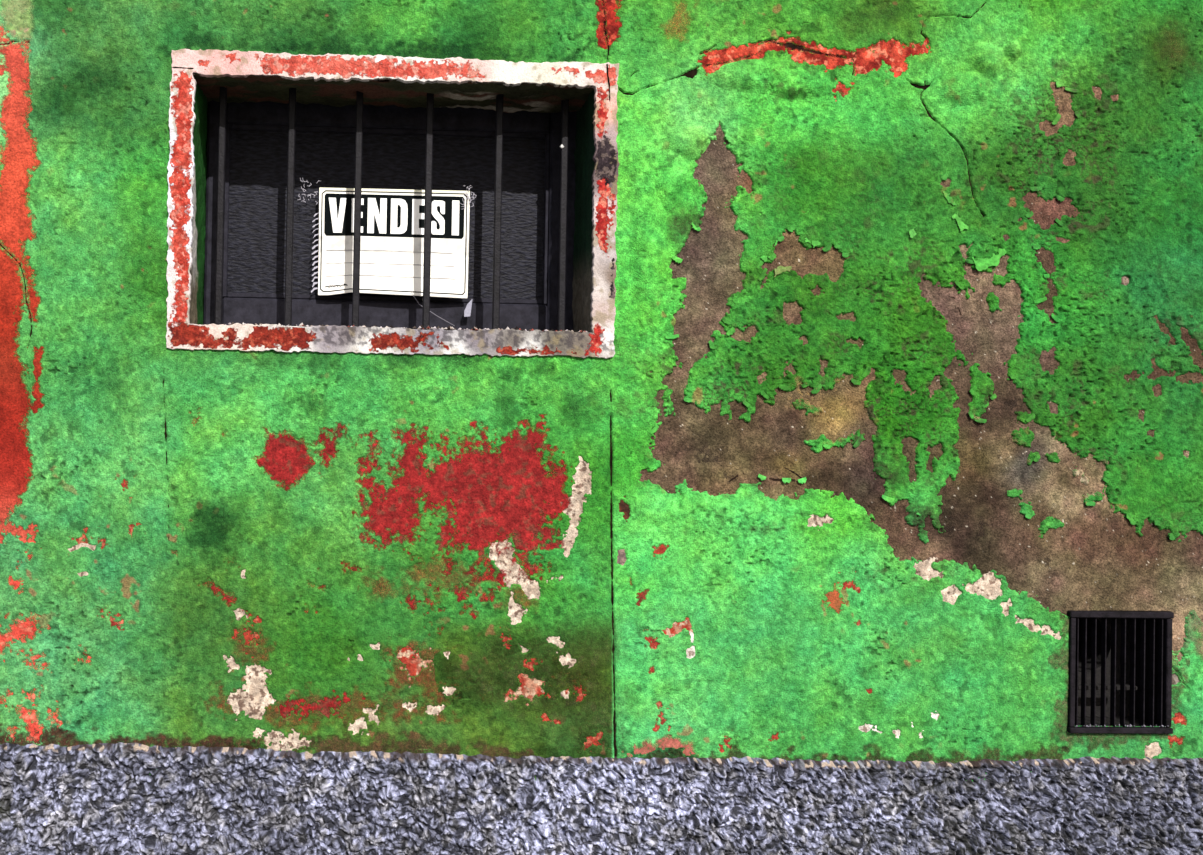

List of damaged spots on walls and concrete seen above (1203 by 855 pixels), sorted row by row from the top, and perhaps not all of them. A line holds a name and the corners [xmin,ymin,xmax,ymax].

crack [602,0,855,101]
peeling [697,31,931,102]
crack [920,2,986,44]
peeling [168,52,485,353]
peeling [552,64,618,299]
crack [910,81,985,217]
peeling [0,26,45,594]
peeling [496,324,605,357]
peeling [639,122,1203,685]
peeling [255,414,592,715]
peeling [0,613,51,670]
peeling [0,689,63,743]